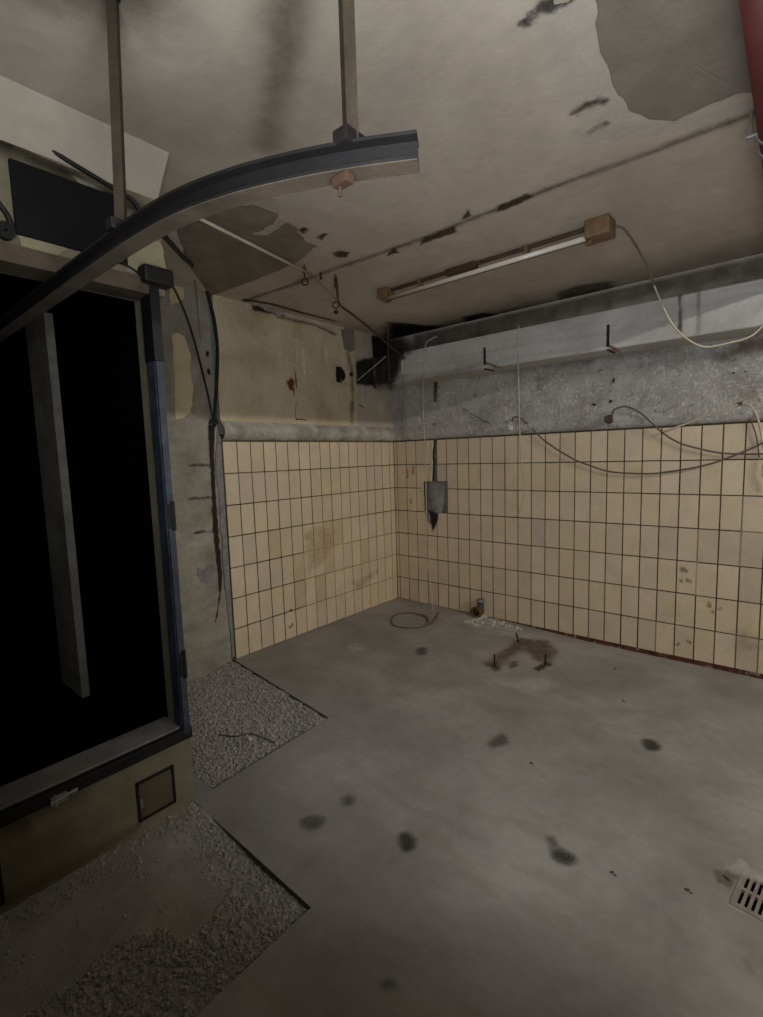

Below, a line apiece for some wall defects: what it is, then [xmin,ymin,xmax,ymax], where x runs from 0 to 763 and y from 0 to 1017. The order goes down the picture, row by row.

spalling [519,0,574,34]
spalling [595,0,752,131]
spalling [572,99,611,140]
peeling [127,240,166,273]
peeling [177,197,316,296]